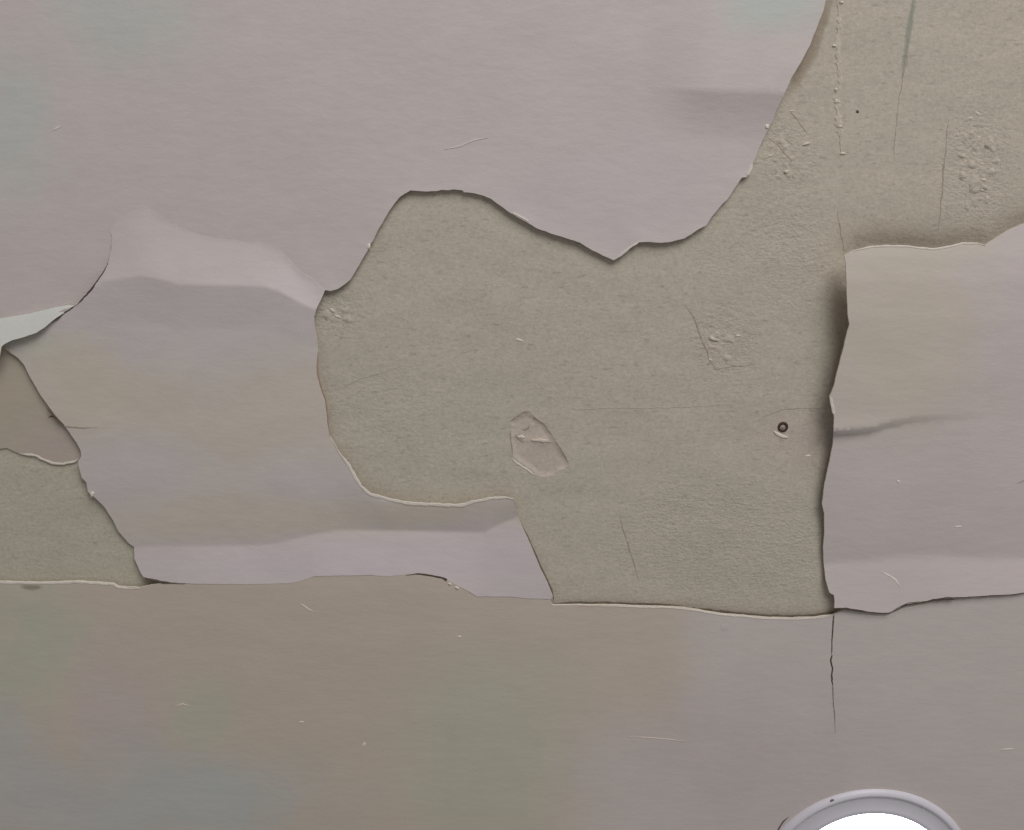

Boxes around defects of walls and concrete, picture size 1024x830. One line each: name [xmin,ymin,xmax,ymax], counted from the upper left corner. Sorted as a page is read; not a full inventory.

peeling [0,305,156,589]
peeling [314,0,1024,620]
crack [830,593,1022,733]